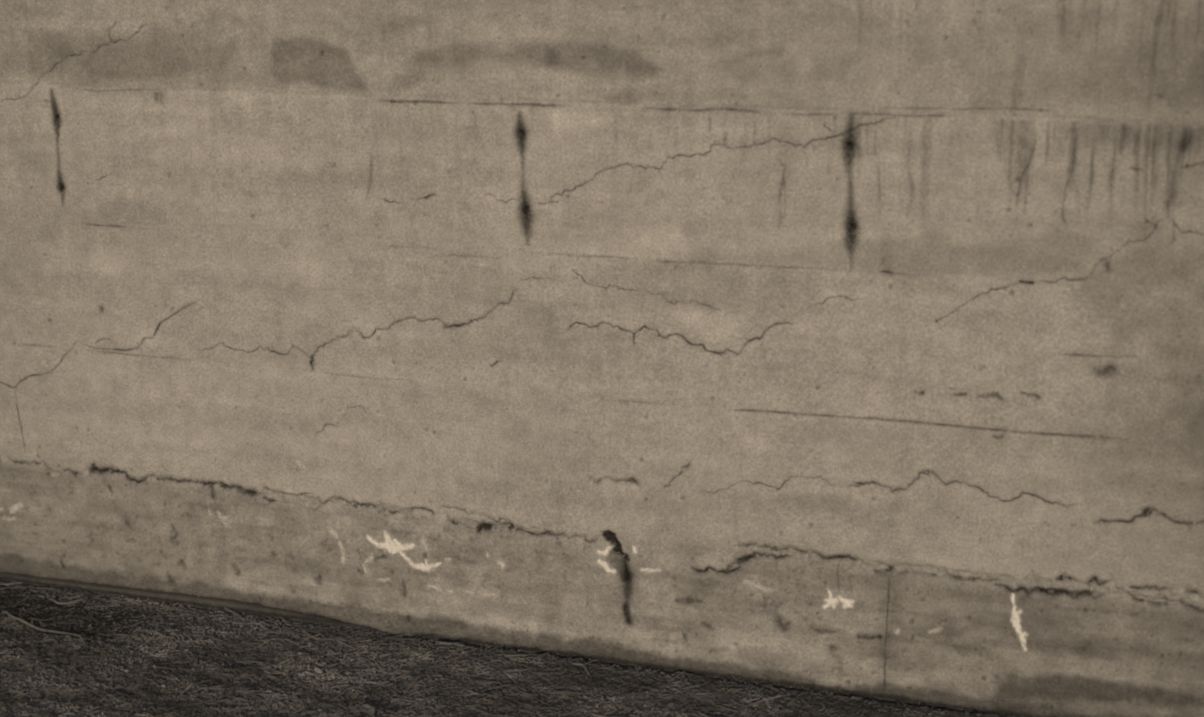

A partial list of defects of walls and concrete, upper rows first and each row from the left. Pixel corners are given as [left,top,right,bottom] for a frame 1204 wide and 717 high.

crack [21,462,278,502]
crack [324,498,592,542]
crack [1101,509,1198,524]
water stain [364,530,495,595]
water stain [596,546,616,574]
crack [696,544,890,615]
water stain [822,590,854,609]
crack [956,575,1198,608]
water stain [1010,593,1028,651]